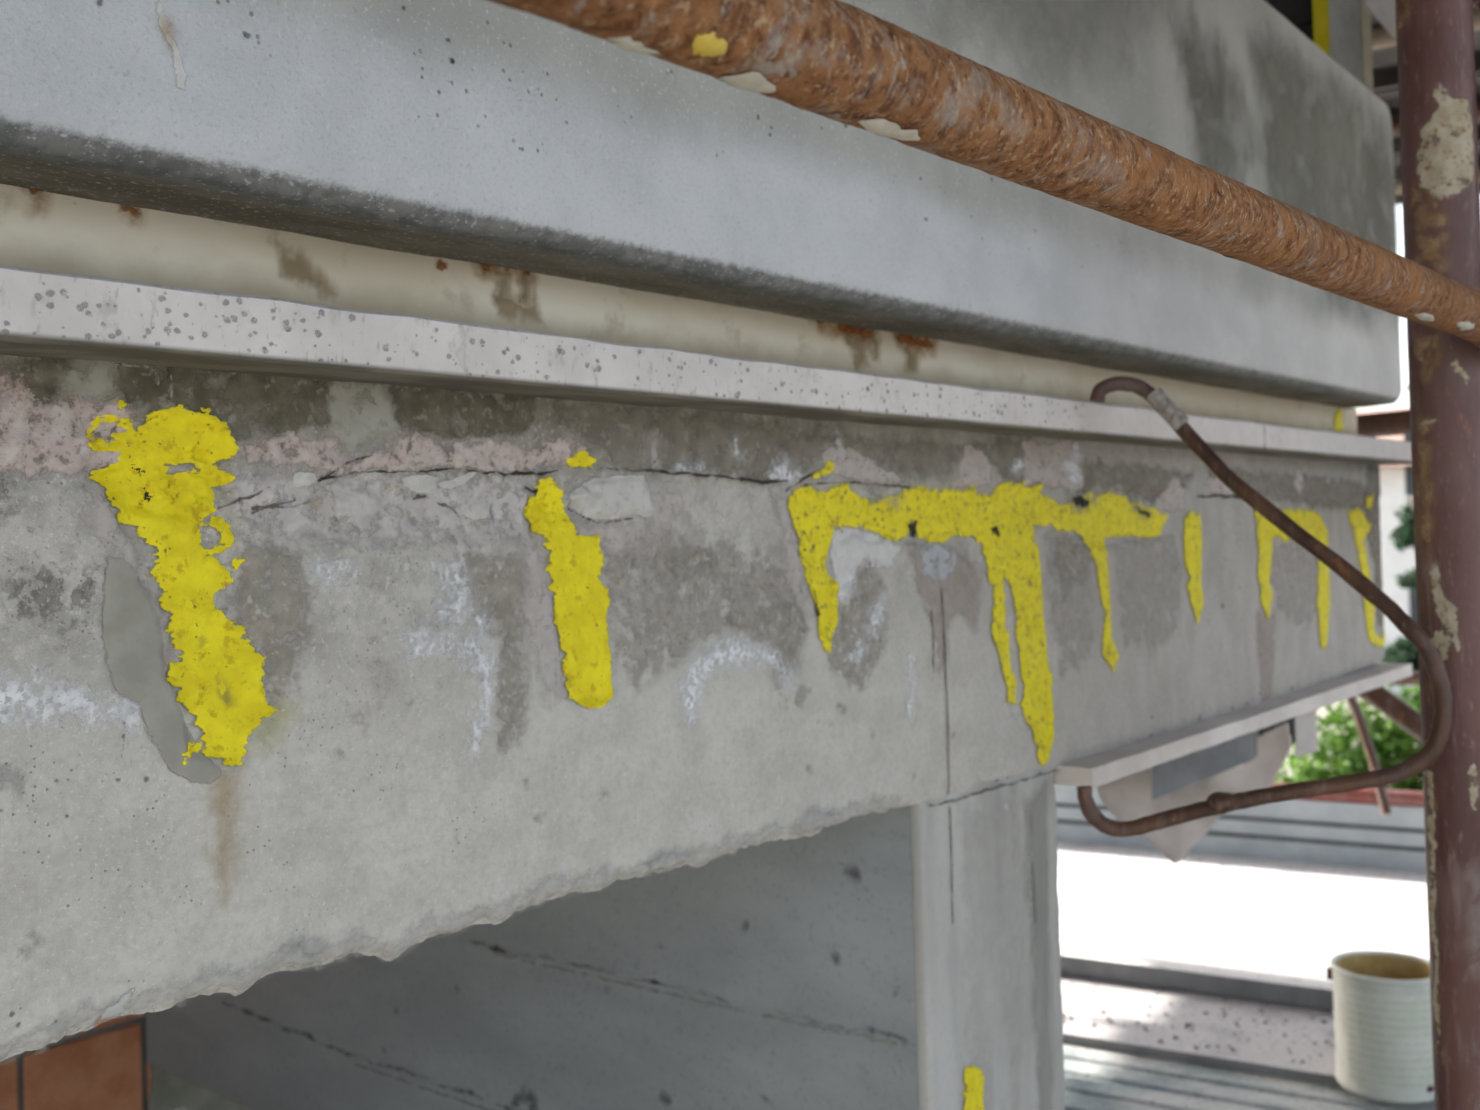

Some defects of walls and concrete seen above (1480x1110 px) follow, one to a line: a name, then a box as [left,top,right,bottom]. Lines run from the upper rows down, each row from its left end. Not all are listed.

rust [817,320,877,369]
rust [896,334,936,370]
spalling [0,374,140,478]
crack [607,468,911,493]
efflorescence [0,675,139,727]
crack [929,589,1059,922]